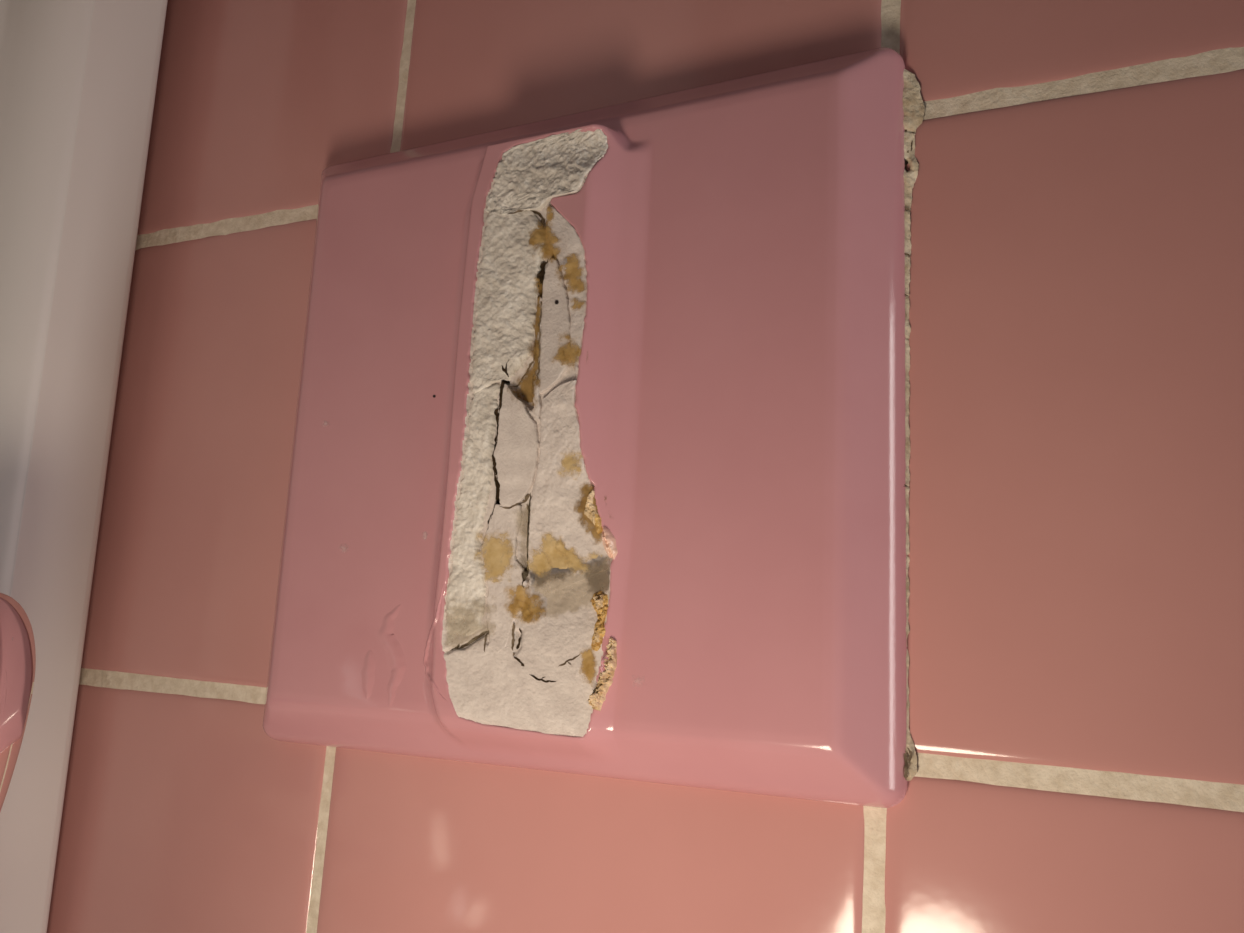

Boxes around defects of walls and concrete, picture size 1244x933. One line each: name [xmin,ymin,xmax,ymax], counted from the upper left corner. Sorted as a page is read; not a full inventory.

crack [508,210,546,230]
crack [488,260,548,588]
spalling [441,128,613,737]
crack [447,623,580,683]